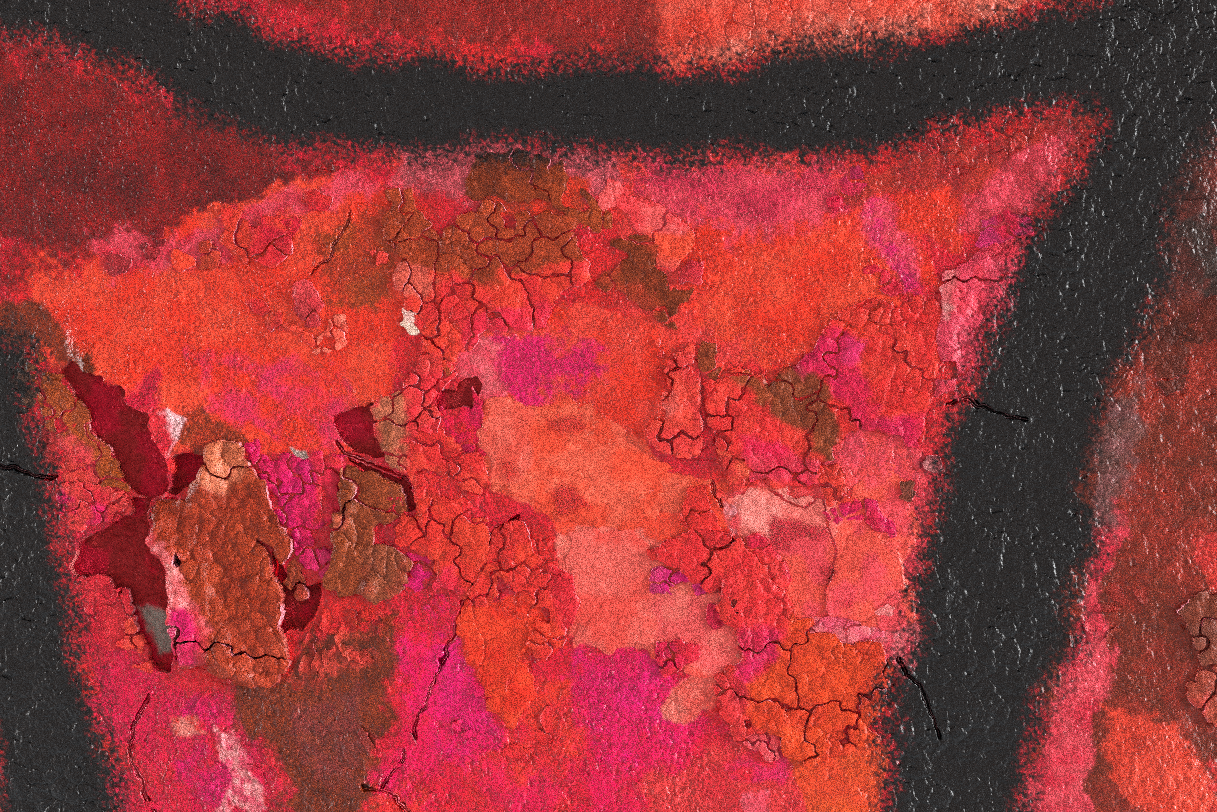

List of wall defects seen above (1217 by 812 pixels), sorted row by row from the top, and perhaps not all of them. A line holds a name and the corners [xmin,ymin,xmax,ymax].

peeling [7,148,1039,769]
crack [364,583,473,812]
peeling [1176,591,1217,727]